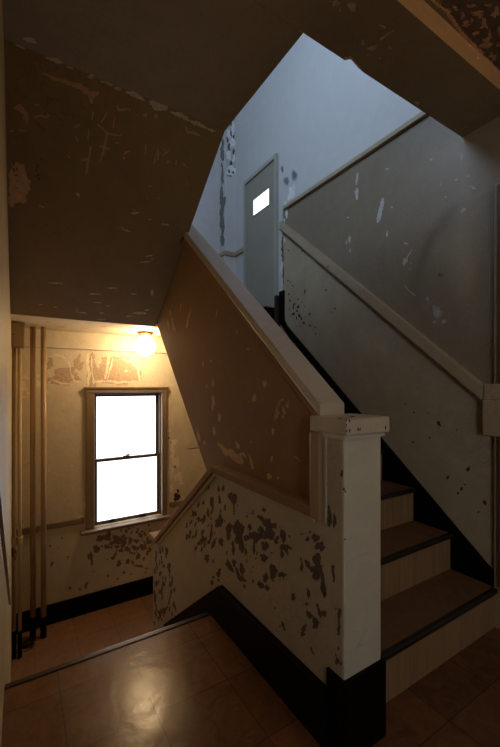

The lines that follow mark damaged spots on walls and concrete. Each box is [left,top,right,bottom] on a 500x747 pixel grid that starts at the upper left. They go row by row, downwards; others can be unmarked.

peeling [428,0,500,70]
peeling [219,120,236,247]
peeling [280,236,316,335]
peeling [22,352,142,398]
peeling [168,437,183,502]
peeling [87,523,176,625]
peeling [185,485,292,591]
peeling [300,531,342,636]